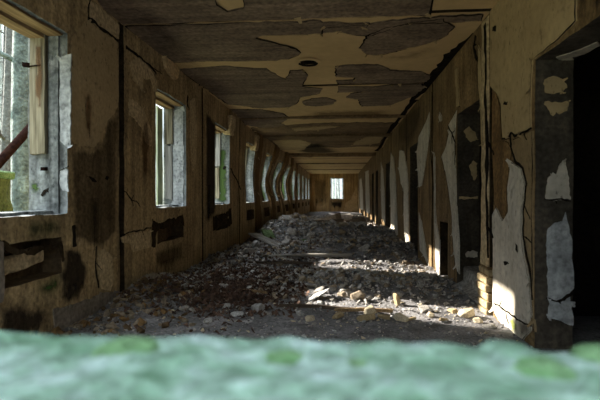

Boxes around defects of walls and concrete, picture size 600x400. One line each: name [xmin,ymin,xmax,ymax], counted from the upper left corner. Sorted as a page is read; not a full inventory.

crack [88,0,162,74]
damp [75,121,116,243]
peeling [67,0,577,340]
crack [375,22,574,304]
spalling [0,240,65,262]
damp [62,250,86,301]
crack [121,227,152,241]
crack [494,301,532,327]